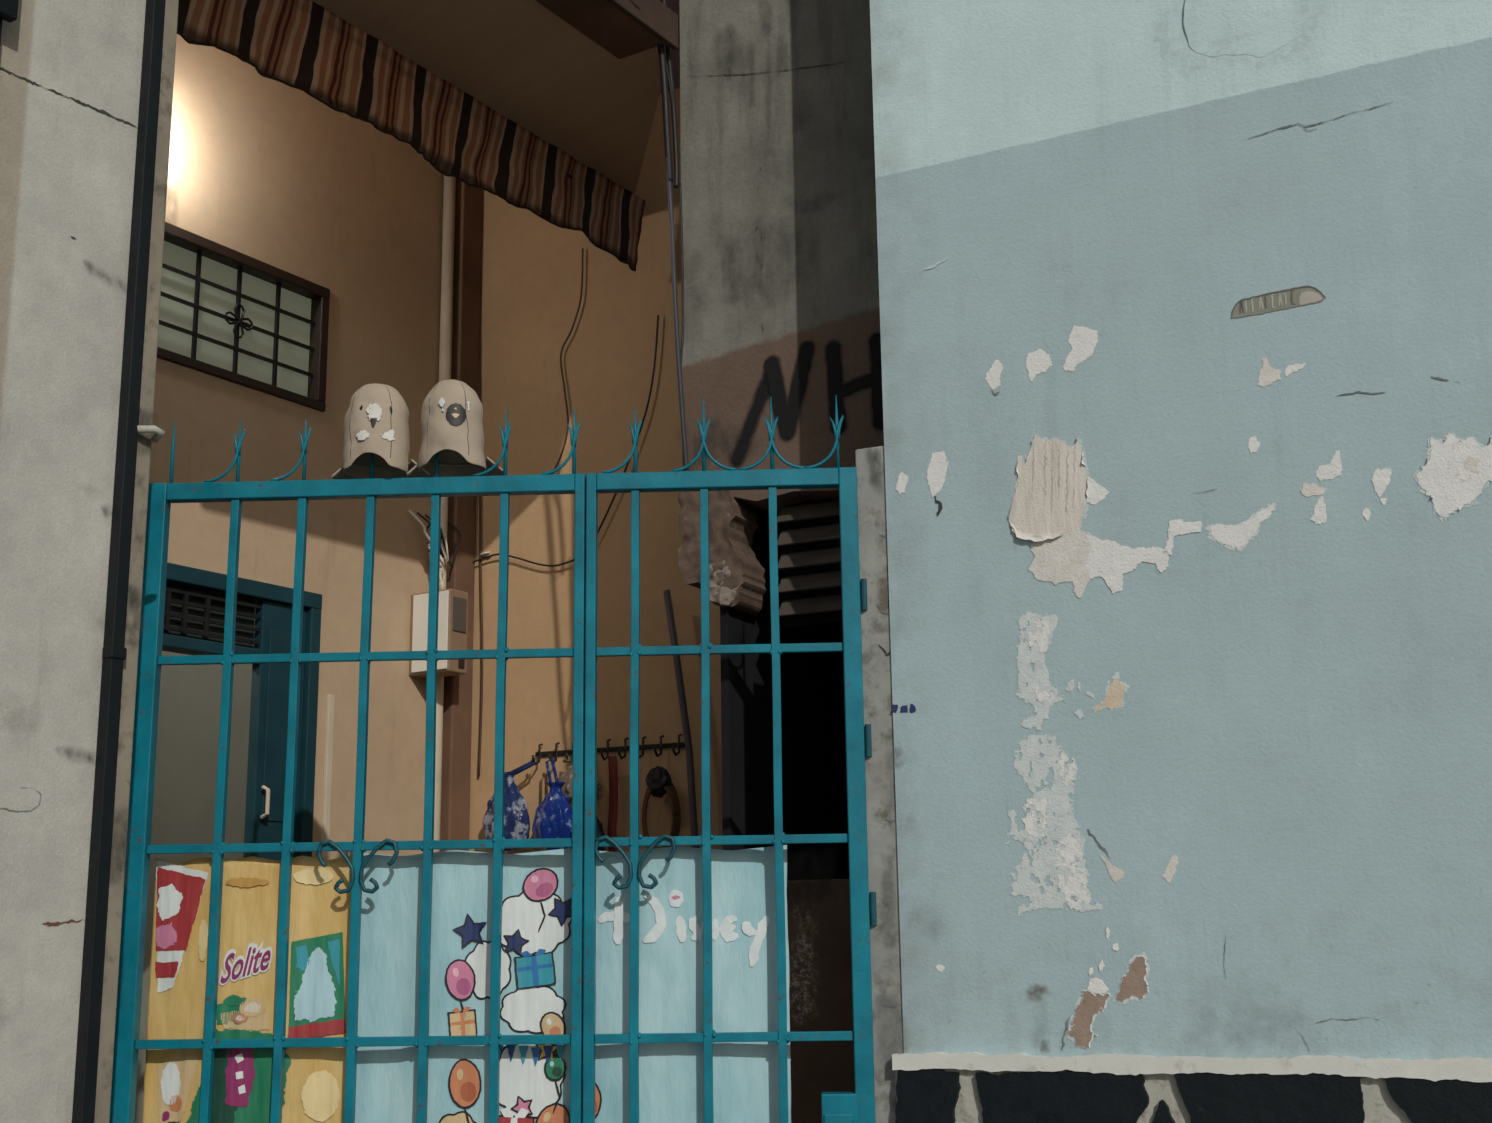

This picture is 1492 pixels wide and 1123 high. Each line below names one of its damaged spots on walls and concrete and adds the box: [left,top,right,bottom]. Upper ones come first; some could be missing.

crack [0,67,136,127]
crack [1242,102,1392,140]
peeling [985,360,1003,395]
peeling [1026,325,1098,381]
peeling [1257,357,1306,387]
peeling [1007,429,1276,599]
peeling [1300,450,1342,524]
peeling [1362,468,1392,521]
peeling [1413,432,1492,522]
peeling [1002,611,1130,916]
spalling [1061,927,1150,1050]